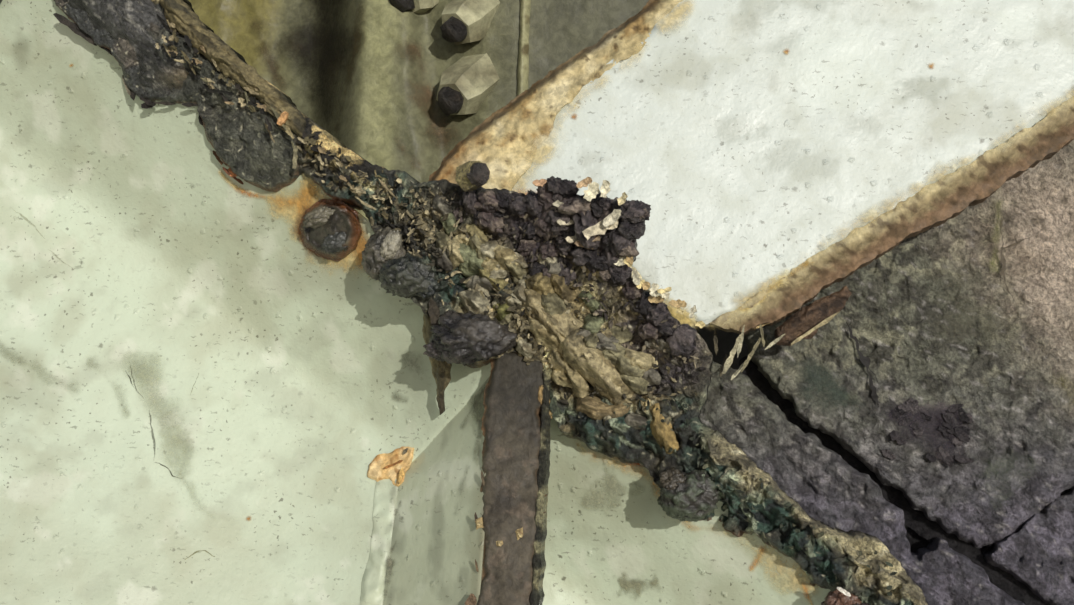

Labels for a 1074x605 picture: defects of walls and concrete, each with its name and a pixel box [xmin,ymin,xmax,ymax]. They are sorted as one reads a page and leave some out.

corrosion [53,0,327,185]
corrosion [243,0,928,605]
peeling [553,177,628,249]
corrosion [709,91,1074,335]
crack [739,356,1047,605]